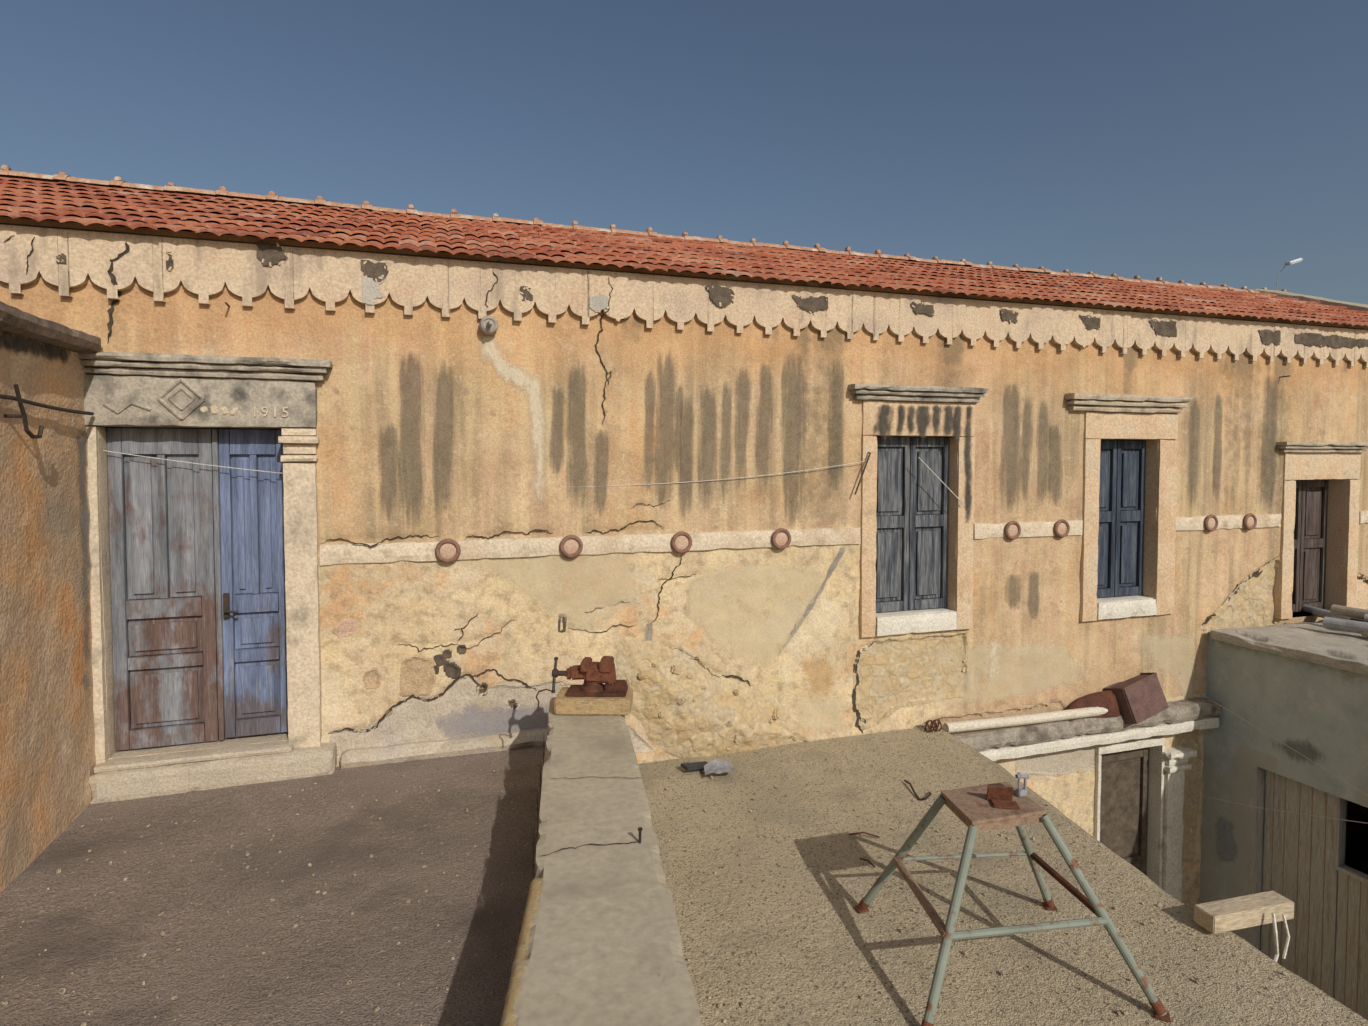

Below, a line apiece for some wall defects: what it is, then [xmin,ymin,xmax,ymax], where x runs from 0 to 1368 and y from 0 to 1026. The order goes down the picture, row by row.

crack [107,242,130,344]
crack [595,283,613,425]
spalling [706,285,735,307]
spalling [792,295,828,315]
leakage [482,335,608,507]
leakage [646,361,801,514]
leakage [1004,387,1060,500]
leakage [1190,398,1222,492]
crack [336,614,537,733]
spalling [328,645,571,759]
crack [568,555,750,685]
spalling [1201,556,1281,631]